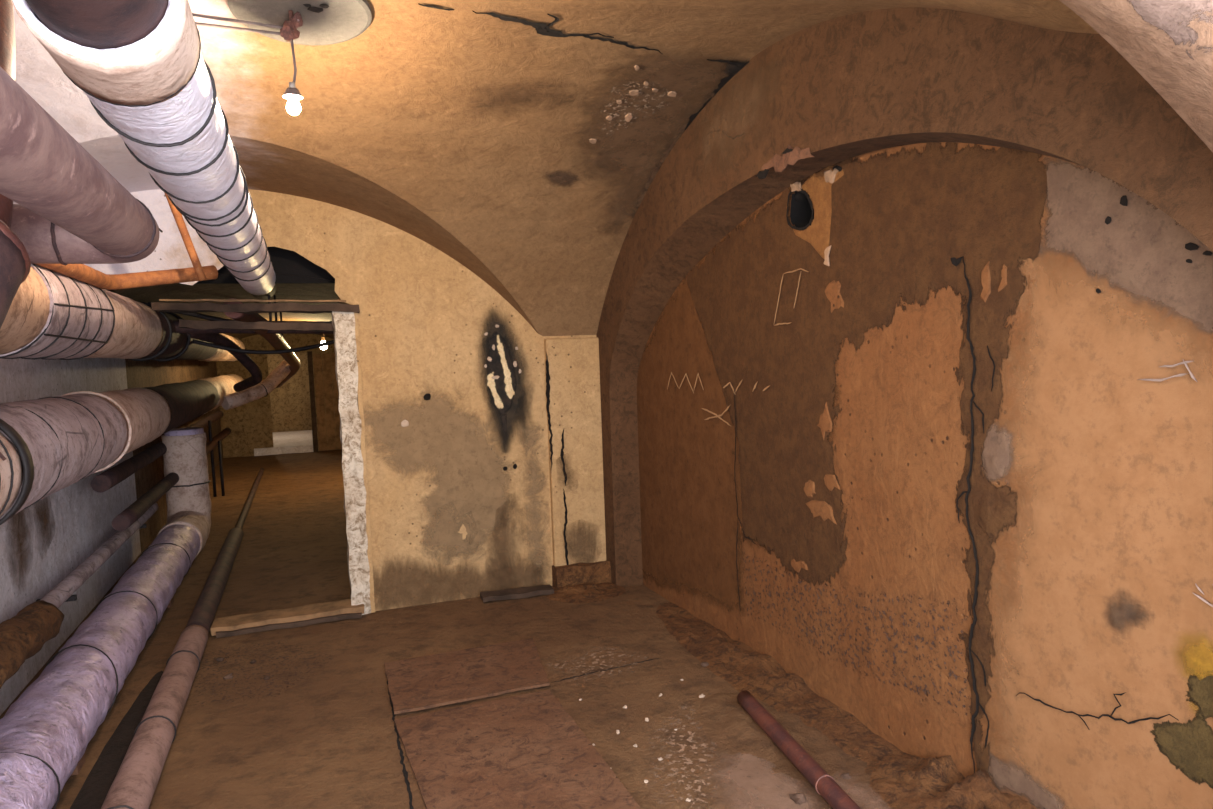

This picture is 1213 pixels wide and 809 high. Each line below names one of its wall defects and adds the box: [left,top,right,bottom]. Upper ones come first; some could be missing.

crack [418,3,662,54]
damp [364,395,545,611]
crack [546,353,569,565]
flaking render [637,142,1213,809]
crack [950,257,995,773]
crack [384,666,414,809]
crack [1016,692,1179,730]